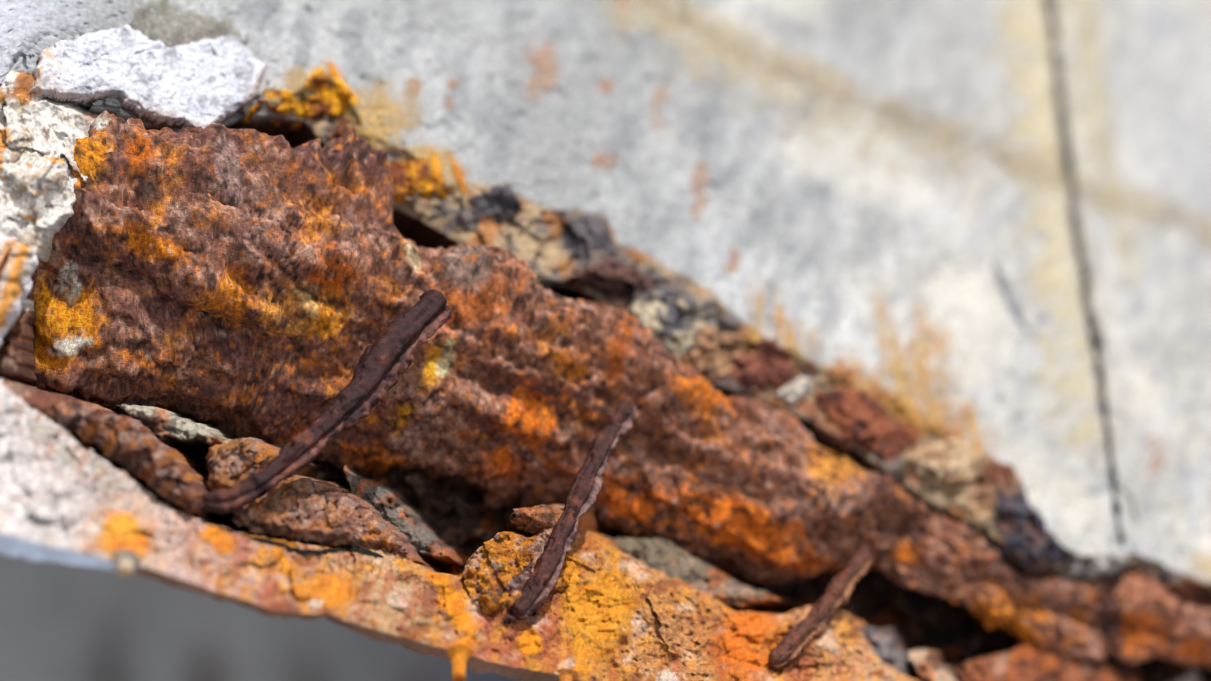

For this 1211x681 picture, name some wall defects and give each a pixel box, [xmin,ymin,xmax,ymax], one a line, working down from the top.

peeling [29,0,266,129]
spalling [0,152,70,222]
rust [243,63,467,205]
spalling [560,213,656,310]
crack [1031,0,1139,541]
spalling [51,399,281,516]
rust [90,509,153,577]
spalling [232,477,426,558]
rust [426,570,477,681]
spalling [462,531,546,624]
rust [556,557,634,681]
rust [712,607,784,681]